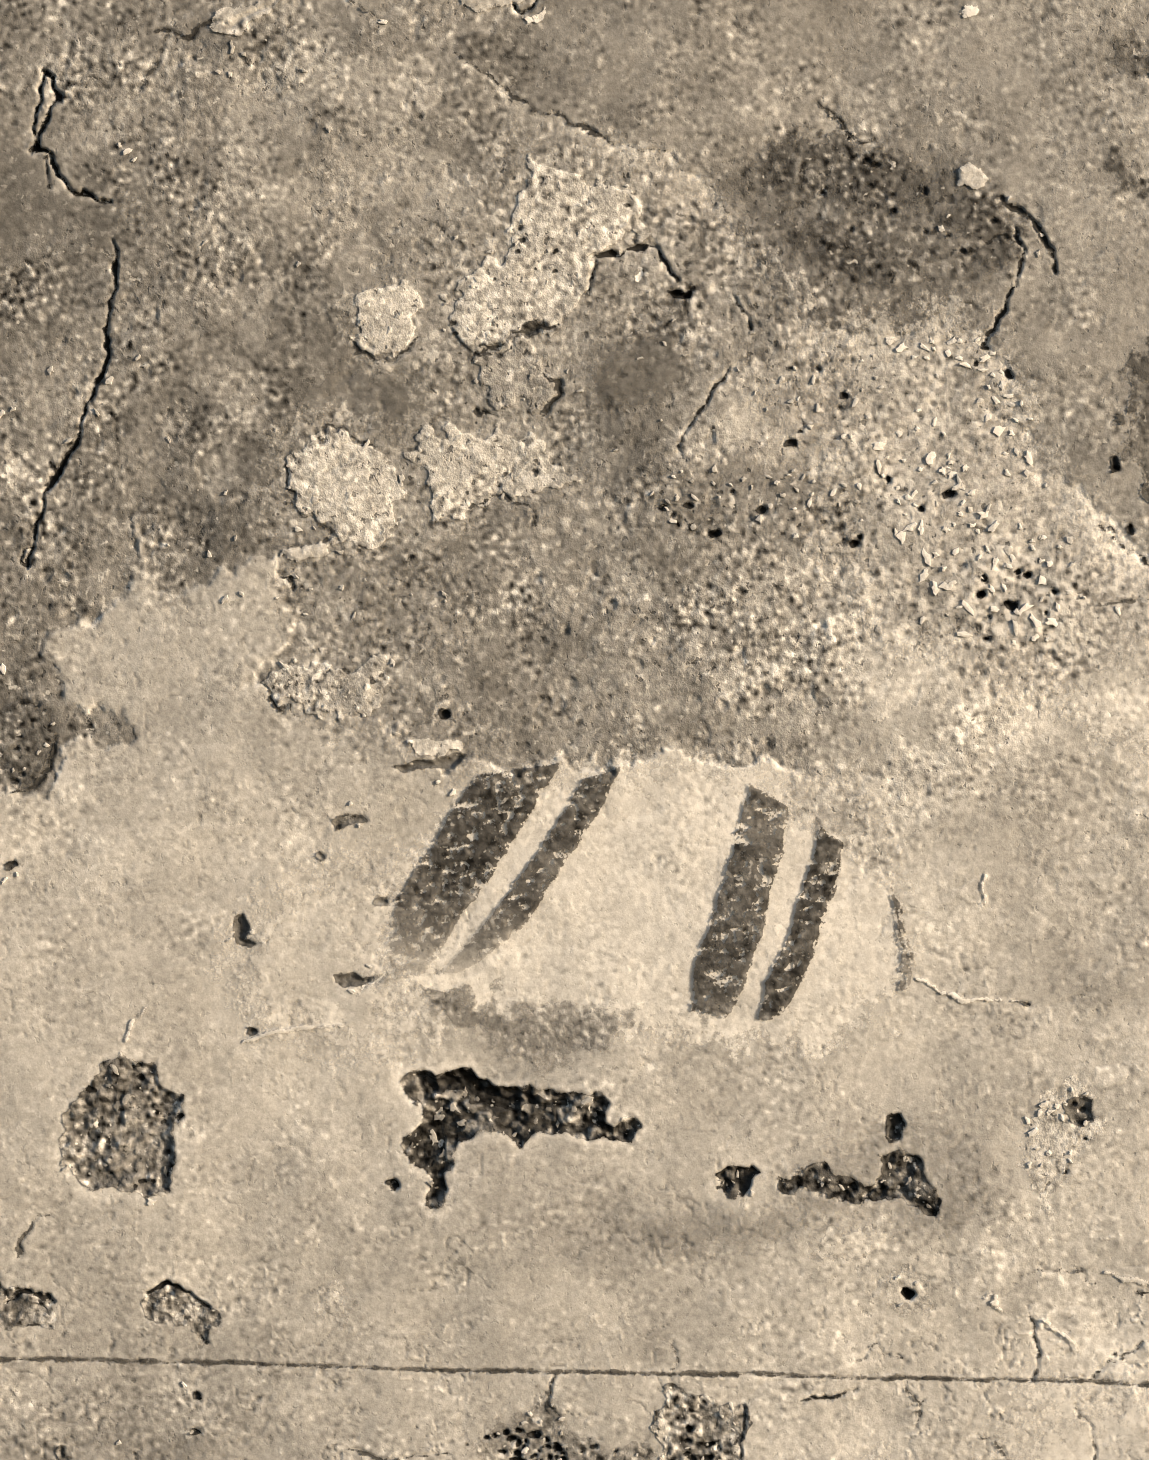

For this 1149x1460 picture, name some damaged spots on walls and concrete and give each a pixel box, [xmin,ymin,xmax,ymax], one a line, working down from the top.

water stain [1111,29,1149,80]
crack [29,69,112,204]
crack [981,230,1025,346]
crack [20,245,119,570]
water stain [254,102,1149,790]
water stain [0,696,60,793]
water stain [784,770,901,884]
flaking render [59,1052,184,1206]
spalling [715,1156,931,1208]
flaking render [140,1281,222,1345]
crack [0,1291,1149,1460]
spalling [466,1383,753,1460]